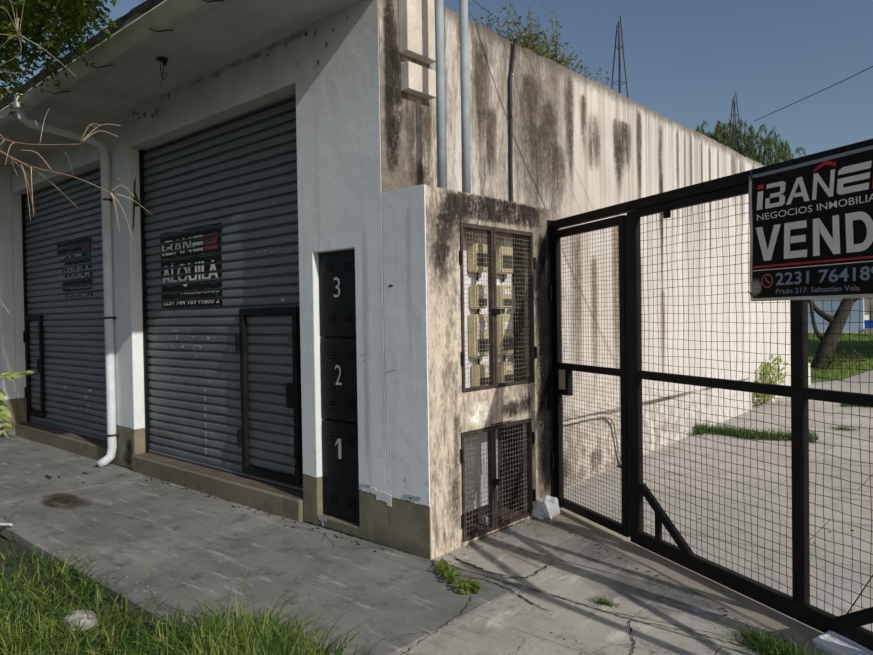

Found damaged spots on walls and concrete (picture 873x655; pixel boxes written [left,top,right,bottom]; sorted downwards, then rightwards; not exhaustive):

leakage [385,0,431,186]
leakage [475,42,496,169]
leakage [524,76,600,195]
leakage [613,114,642,198]
leakage [676,135,719,189]
leakage [470,403,490,424]
leakage [504,396,531,417]
leakage [537,237,551,487]
crack [215,496,741,655]